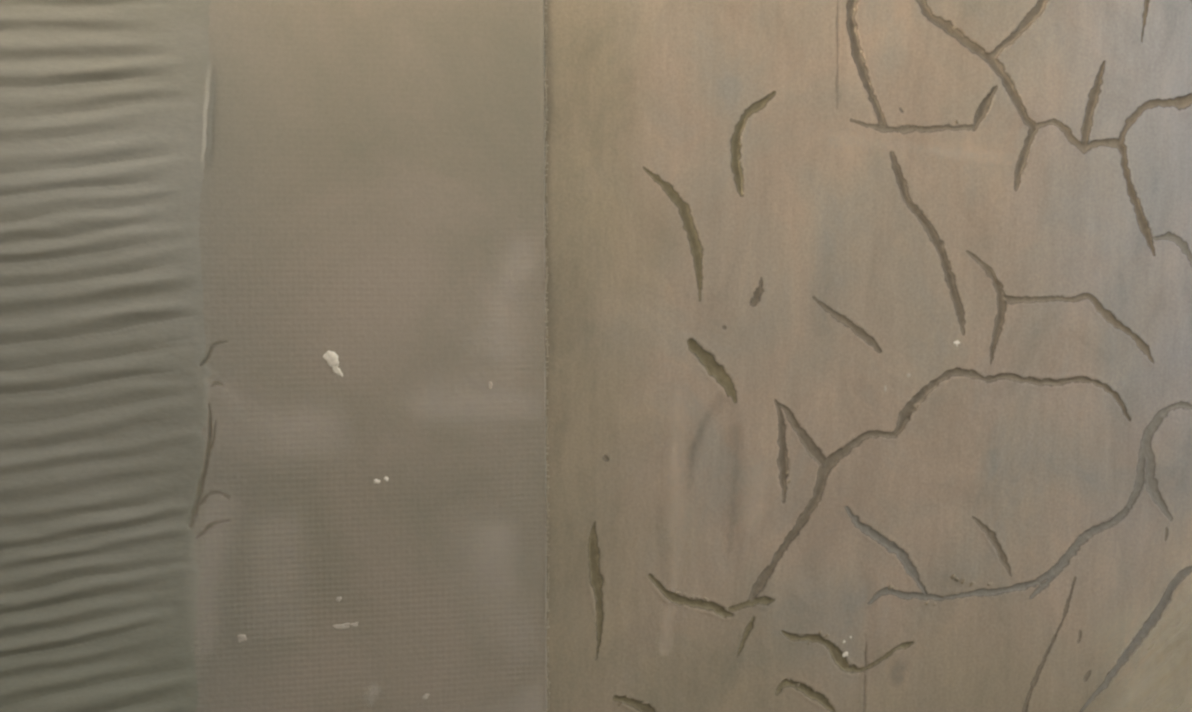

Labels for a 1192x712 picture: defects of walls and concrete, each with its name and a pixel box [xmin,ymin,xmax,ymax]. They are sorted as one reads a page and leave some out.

crack [643,0,1192,712]
crack [588,521,603,658]
crack [613,695,655,712]